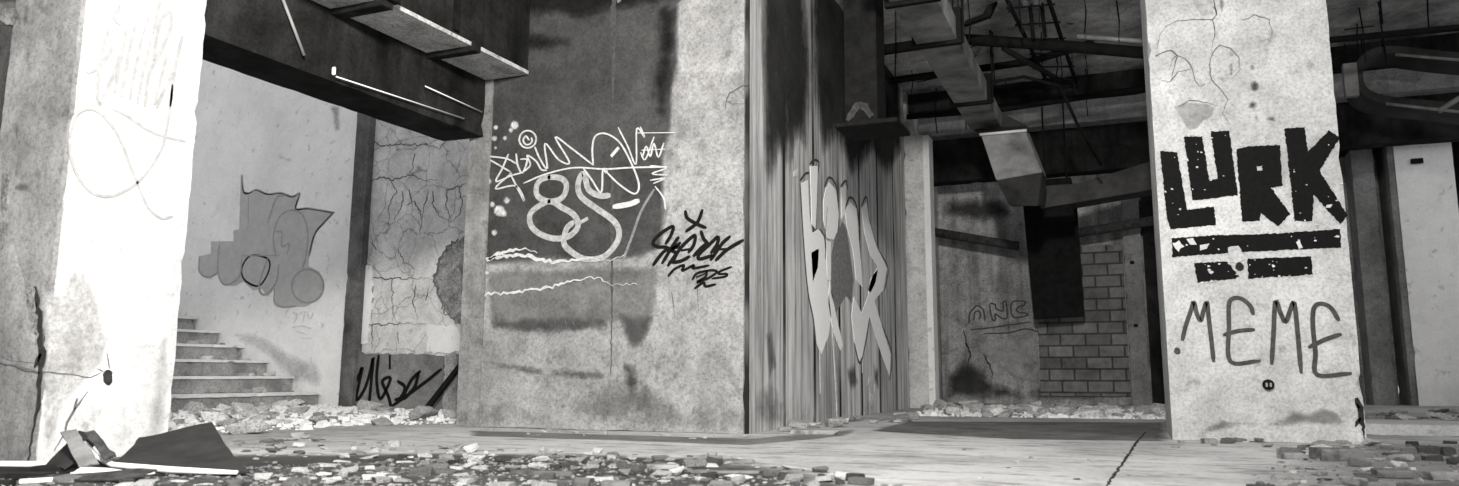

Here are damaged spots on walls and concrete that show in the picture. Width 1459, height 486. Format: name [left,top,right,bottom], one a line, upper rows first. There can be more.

crack [1156,0,1272,124]
crack [369,141,465,346]
spalling [433,235,465,324]
peeling [485,247,636,297]
crack [2,286,110,460]
crack [1106,432,1146,486]